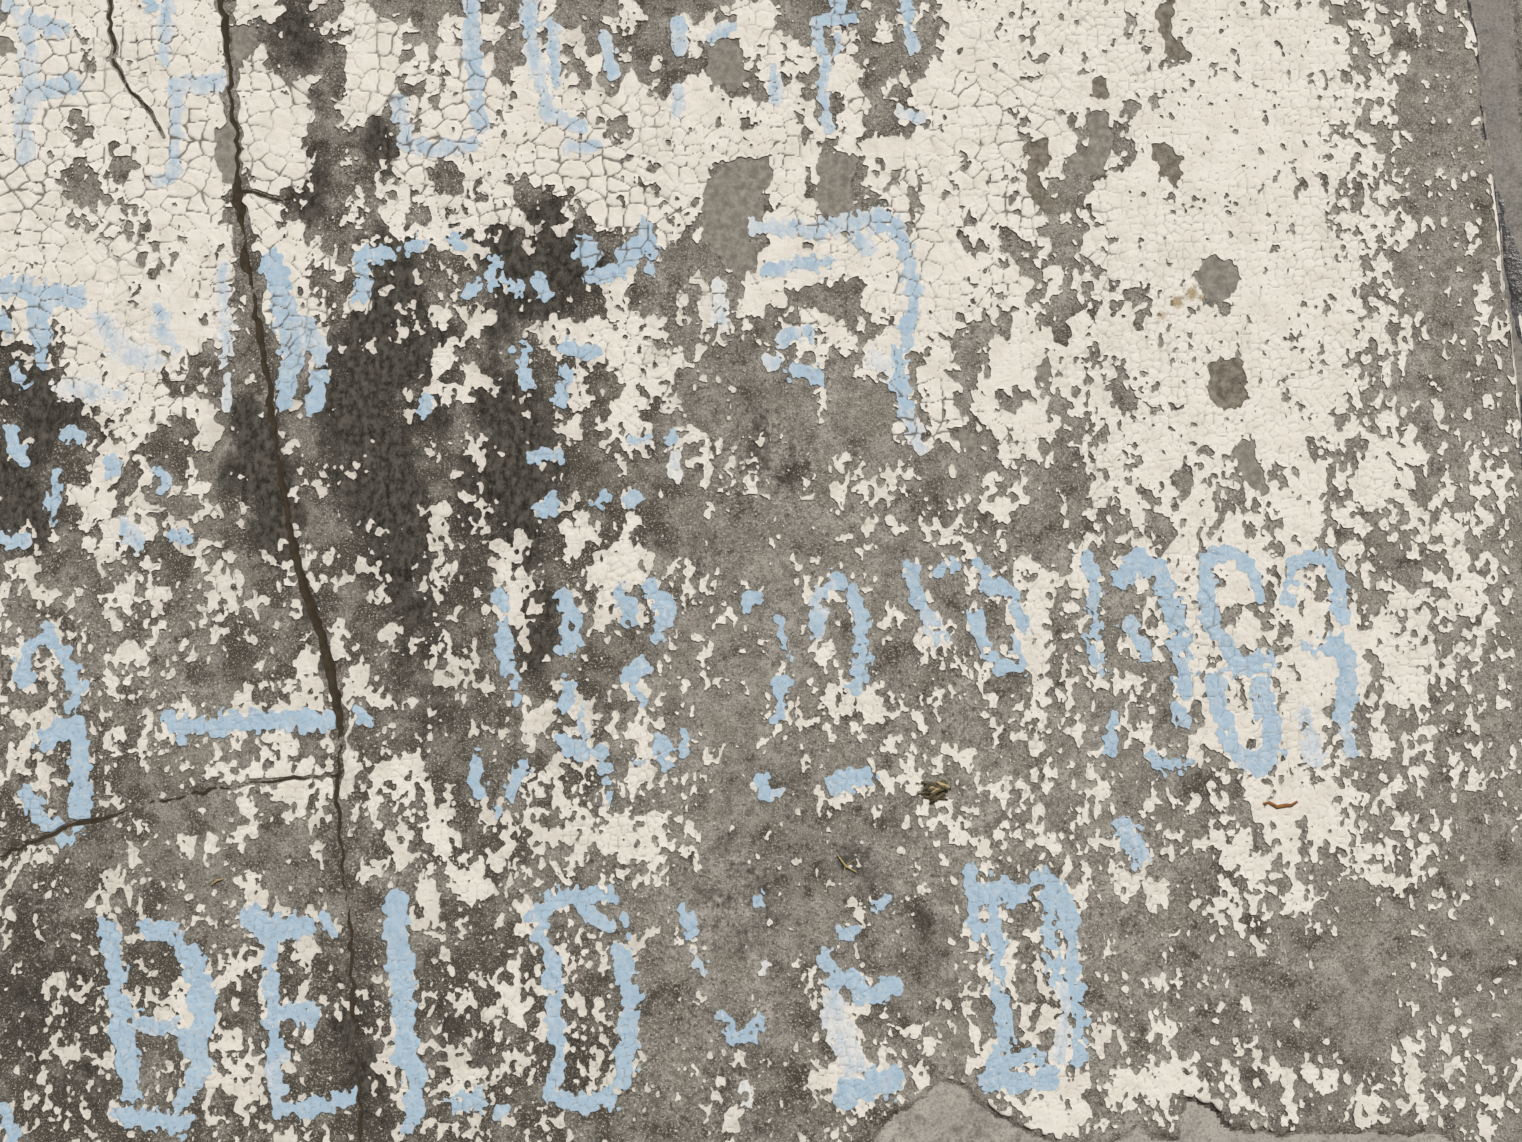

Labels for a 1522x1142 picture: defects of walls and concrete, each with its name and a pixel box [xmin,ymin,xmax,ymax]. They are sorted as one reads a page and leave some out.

peeling [0,295,37,371]
peeling [1441,255,1517,410]
peeling [258,377,375,503]
crack [0,0,363,1142]
peeling [250,523,392,619]
peeling [338,509,390,545]
peeling [790,553,878,626]
peeling [872,601,909,646]
peeling [468,717,510,762]
peeling [815,846,931,952]
peeling [1428,873,1477,922]
spalling [673,889,1522,1142]